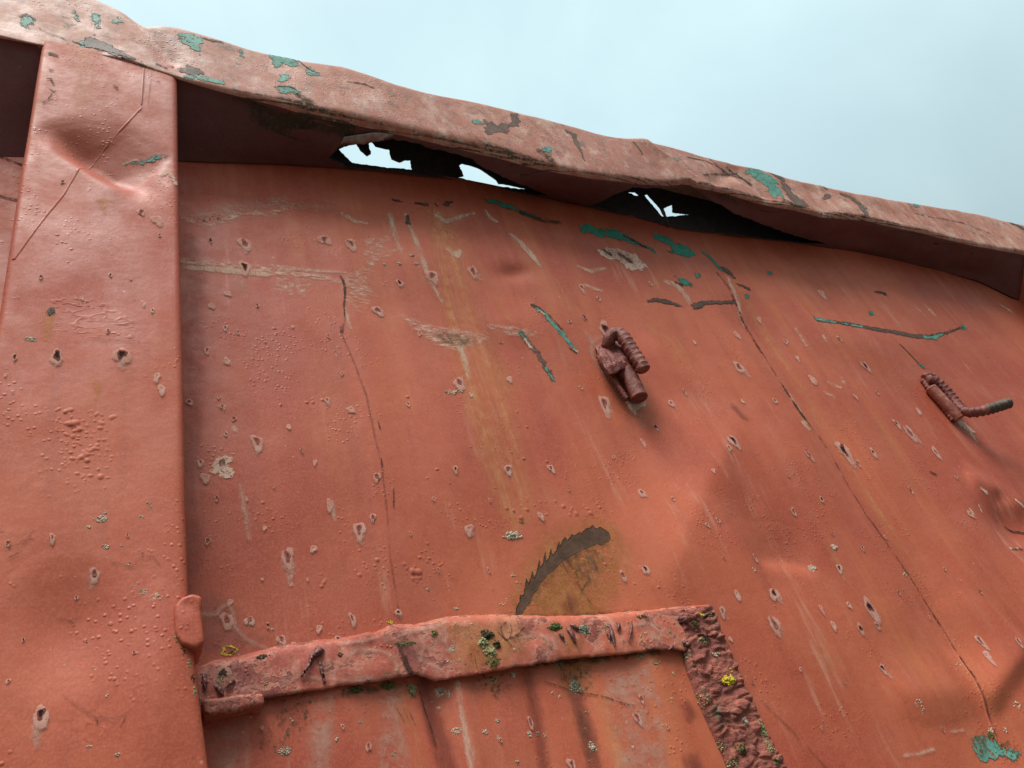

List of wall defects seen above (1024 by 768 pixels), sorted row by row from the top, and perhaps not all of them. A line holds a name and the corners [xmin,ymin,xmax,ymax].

peeling [177,33,225,84]
peeling [269,54,321,94]
peeling [472,113,521,134]
peeling [727,167,809,207]
peeling [580,224,736,279]
crack [340,276,350,332]
crack [647,272,821,440]
corrosion [517,525,633,647]
crack [835,462,997,736]
corrosion [300,646,326,684]
corrosion [571,687,596,760]
peeling [972,735,1021,762]